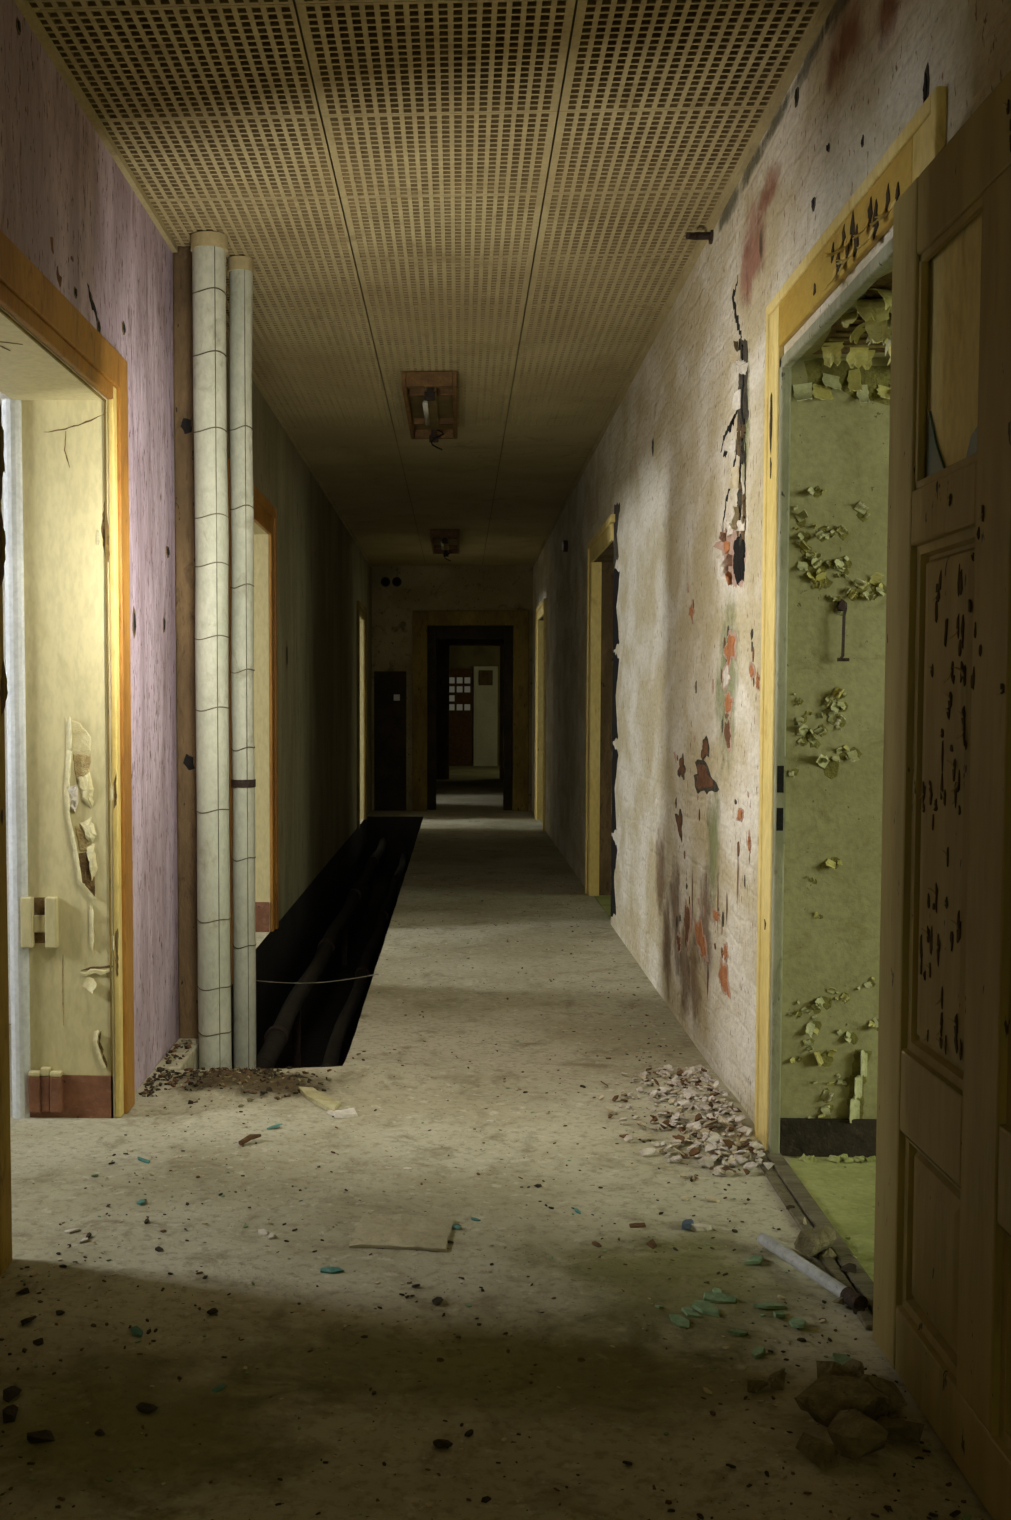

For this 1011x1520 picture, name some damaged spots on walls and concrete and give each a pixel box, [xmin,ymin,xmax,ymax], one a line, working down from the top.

peeling [793,272,892,405]
spalling [713,523,747,588]
peeling [793,486,887,616]
spalling [674,625,760,859]
peeling [794,687,862,779]
spalling [676,883,731,999]
peeling [788,977,878,1123]